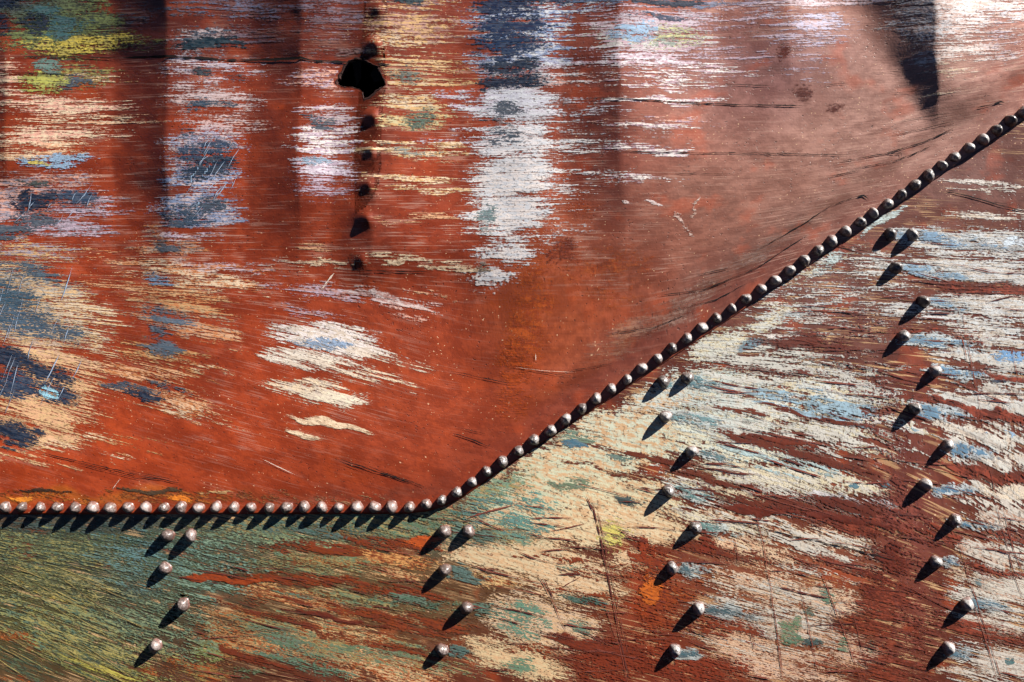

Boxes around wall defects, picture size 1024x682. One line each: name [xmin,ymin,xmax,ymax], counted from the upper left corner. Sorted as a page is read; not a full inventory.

peeling [0,0,1024,471]
peeling [0,205,1024,682]